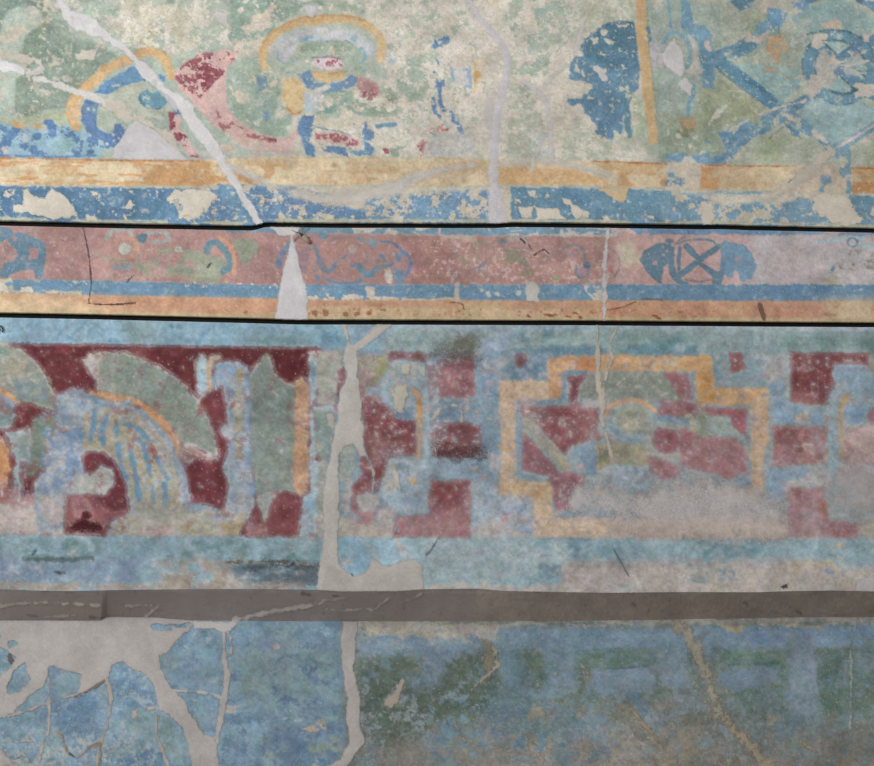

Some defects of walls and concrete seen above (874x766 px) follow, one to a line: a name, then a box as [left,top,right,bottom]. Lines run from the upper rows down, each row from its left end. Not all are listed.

crack [0,45,109,109]
flaking render [649,38,693,97]
crack [43,0,622,256]
peeling [4,186,98,222]
peeling [167,188,217,220]
peeling [514,190,590,222]
peeling [812,192,874,227]
crack [83,228,135,305]
crack [173,324,437,766]
crack [0,676,114,766]
flaking render [0,616,237,766]
crack [154,714,170,766]